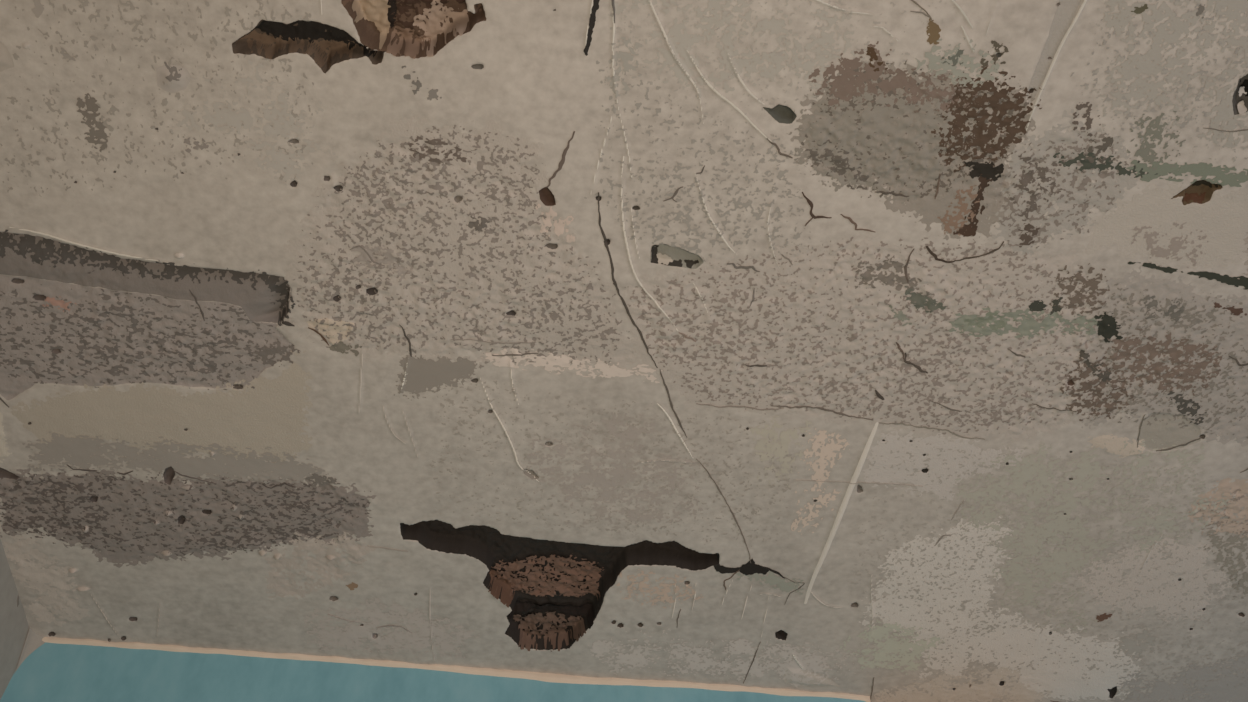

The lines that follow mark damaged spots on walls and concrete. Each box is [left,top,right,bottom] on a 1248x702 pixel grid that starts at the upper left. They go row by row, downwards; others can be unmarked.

crack [584,0,615,56]
crack [546,131,575,188]
flaking render [0,0,1248,463]
crack [664,165,705,202]
crack [767,139,793,158]
corrosion [808,41,1042,173]
leakage [604,0,1248,247]
corrosion [937,185,981,237]
leakage [1128,222,1248,290]
spalling [400,520,720,652]